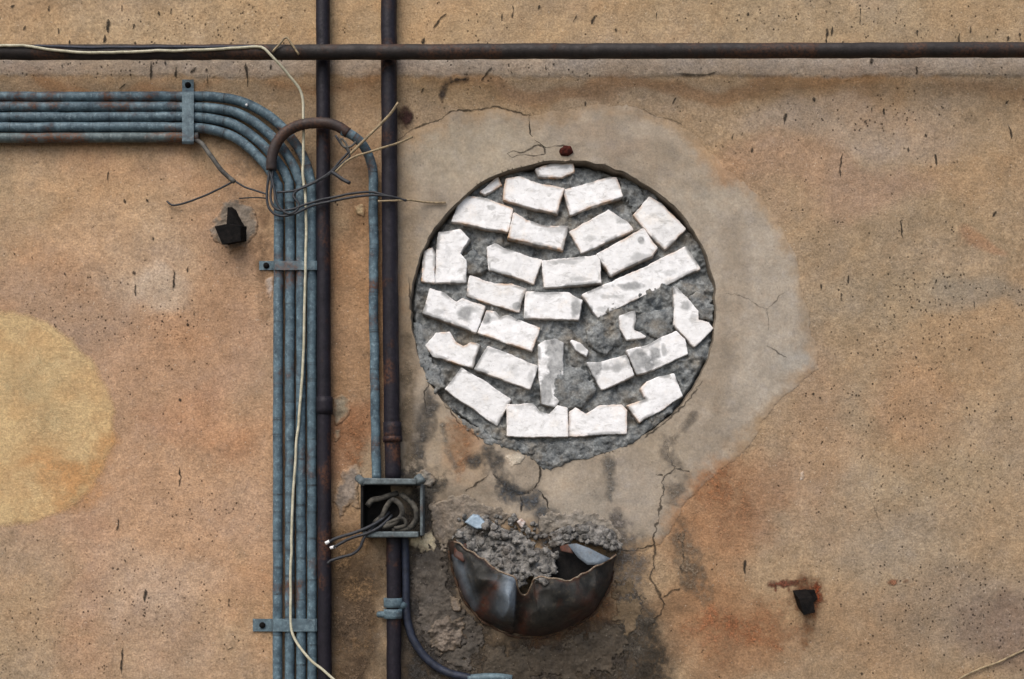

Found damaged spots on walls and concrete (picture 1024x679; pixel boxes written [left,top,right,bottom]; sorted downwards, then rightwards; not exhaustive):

crack [398,106,563,157]
peeling [506,452,526,467]
spalling [409,494,647,679]
water stain [400,362,672,679]
crack [617,465,689,675]
rust [768,577,823,645]